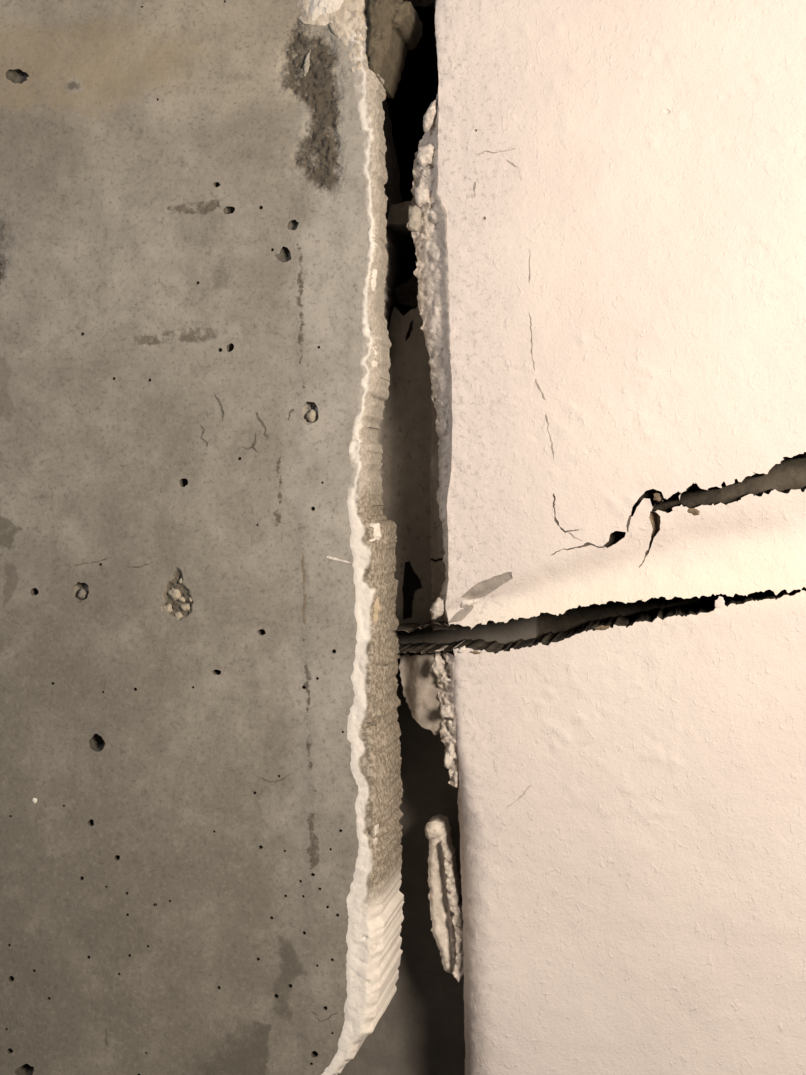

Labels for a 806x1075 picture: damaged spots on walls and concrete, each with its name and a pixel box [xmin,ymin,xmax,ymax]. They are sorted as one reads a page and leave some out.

spalling [0,204,17,301]
crack [405,320,413,341]
crack [529,312,554,458]
spalling [160,566,194,621]
spalling [273,0,422,1075]
crack [393,587,806,654]
crack [551,452,806,567]
spalling [431,646,459,787]
peeling [425,814,464,982]